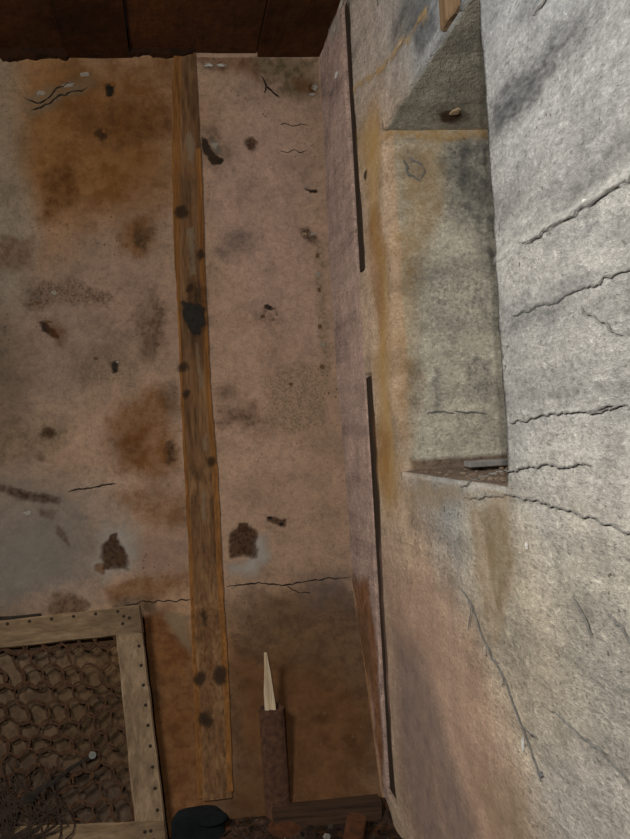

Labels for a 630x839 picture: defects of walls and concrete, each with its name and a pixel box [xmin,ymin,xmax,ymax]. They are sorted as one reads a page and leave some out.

crack [261,76,279,97]
spalling [202,138,223,165]
crack [510,267,630,335]
crack [509,403,625,423]
crack [69,483,116,492]
crack [461,462,630,534]
crack [226,576,351,593]
crack [126,598,190,606]
crack [572,596,592,638]
crack [607,613,630,643]
crack [460,588,543,781]
crack [550,711,630,785]